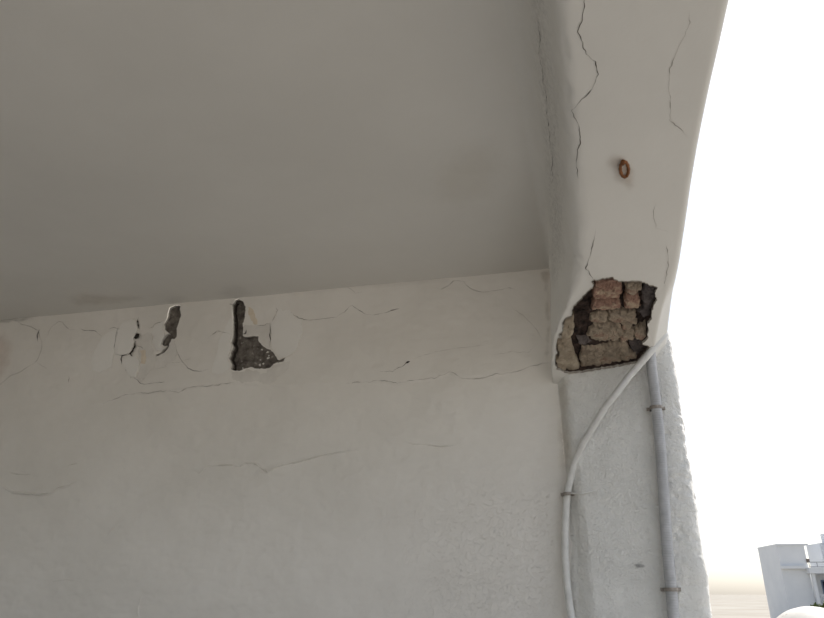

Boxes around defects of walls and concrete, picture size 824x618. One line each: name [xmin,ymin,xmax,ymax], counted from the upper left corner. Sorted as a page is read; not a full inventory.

crack [571,3,599,176]
flaking render [156,305,181,356]
flaking render [229,299,285,371]
flaking render [555,277,658,374]